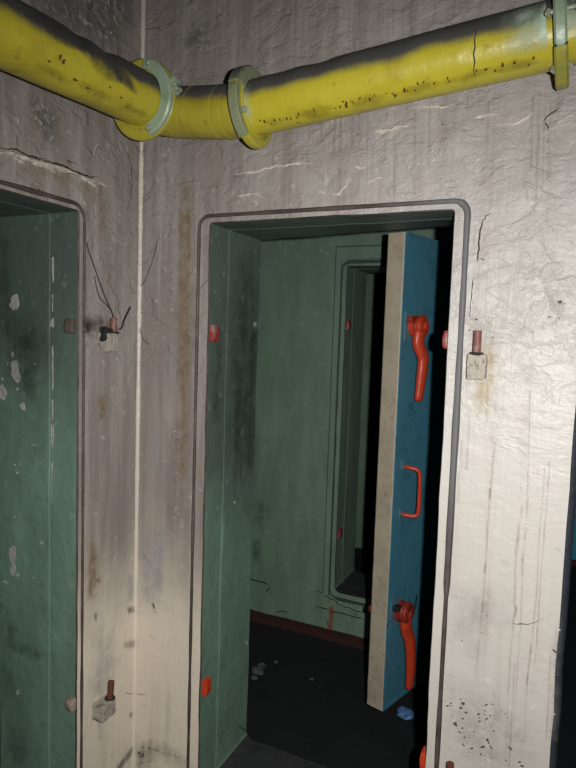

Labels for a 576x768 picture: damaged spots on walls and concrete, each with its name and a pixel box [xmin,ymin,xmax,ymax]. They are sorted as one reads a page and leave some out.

crack [469,213,491,317]
peeling [9,294,19,310]
peeling [0,352,21,400]
crack [313,590,365,619]